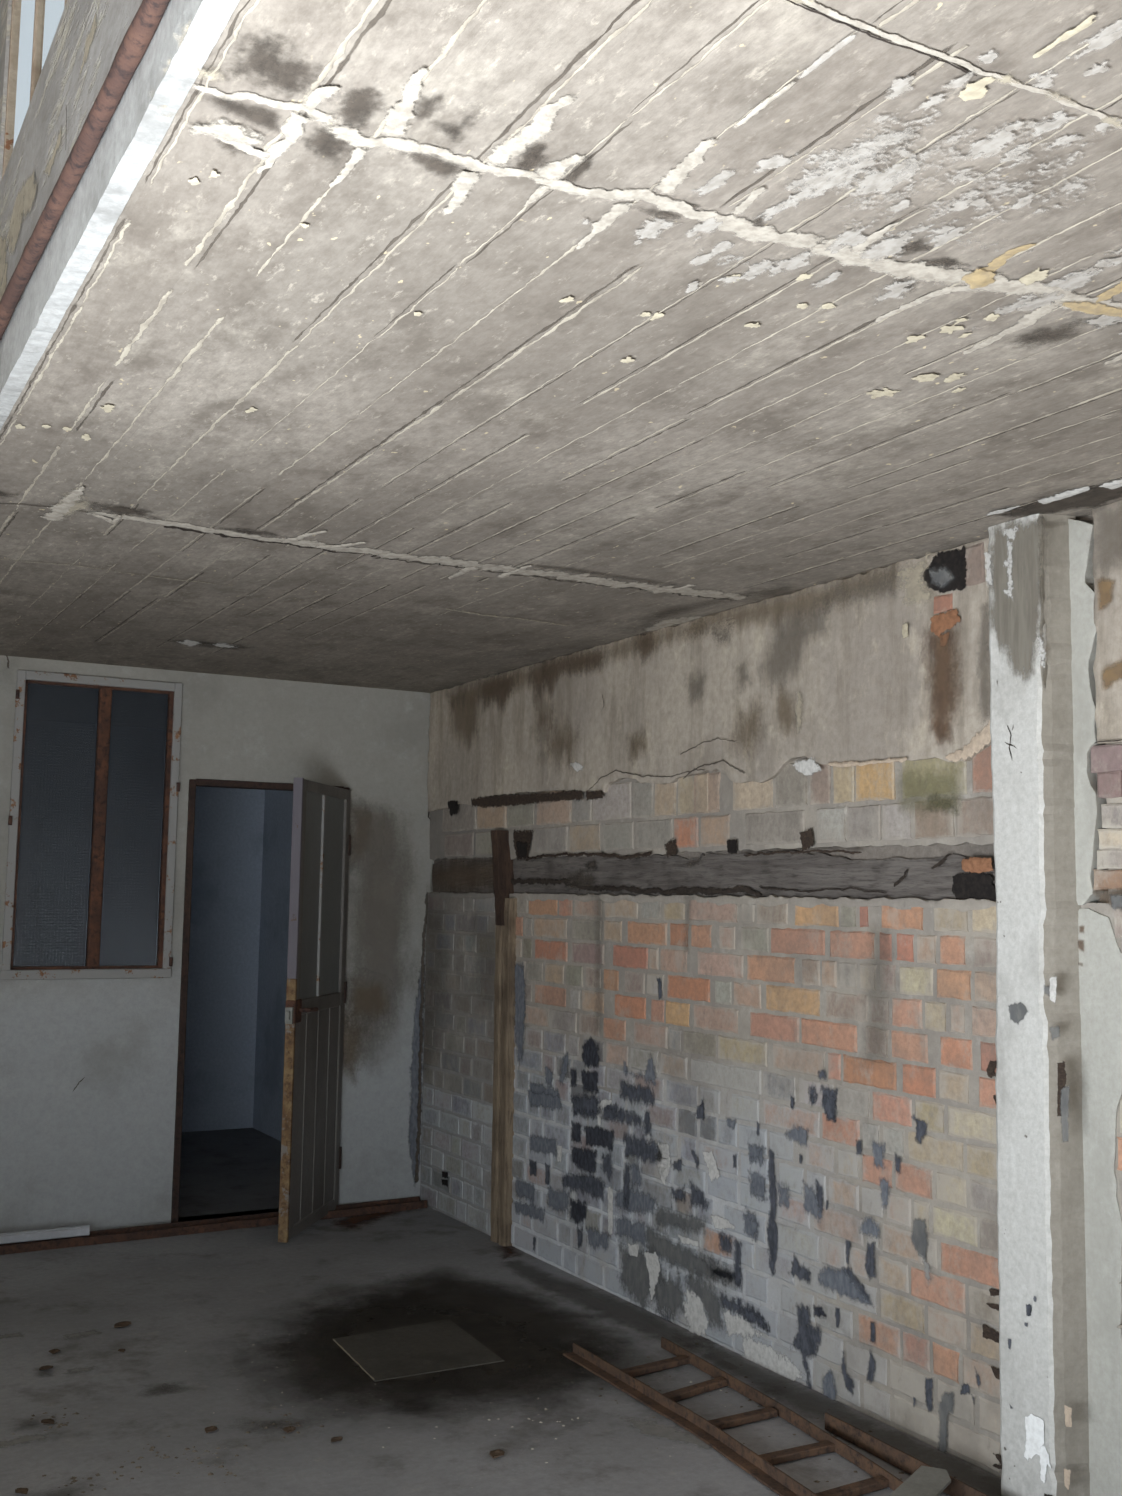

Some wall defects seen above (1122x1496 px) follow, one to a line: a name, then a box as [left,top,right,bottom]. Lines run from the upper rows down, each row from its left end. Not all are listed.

leakage [236,37,309,91]
crack [786,0,1122,129]
peeling [1030,15,1122,89]
leakage [213,99,276,130]
leakage [306,89,378,157]
leakage [413,154,458,176]
crack [192,68,1122,355]
peeling [634,50,1122,310]
peeling [904,249,1122,344]
crack [1104,354,1122,365]
crack [0,486,747,626]
spalling [896,545,967,646]